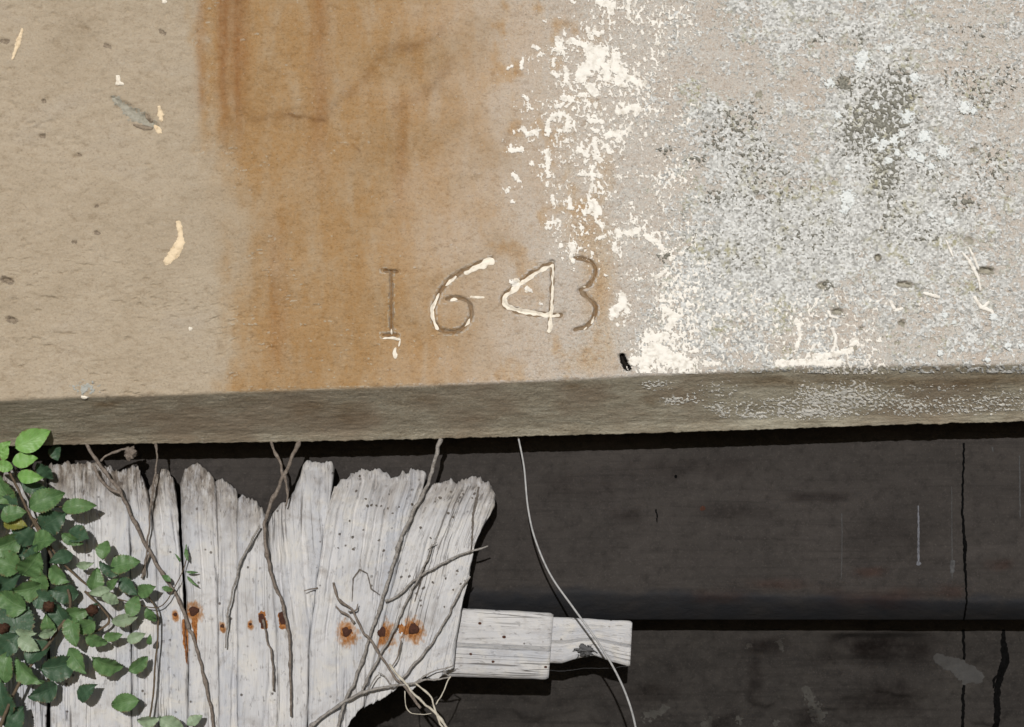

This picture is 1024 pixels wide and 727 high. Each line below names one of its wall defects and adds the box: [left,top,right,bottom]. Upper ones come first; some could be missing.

spalling [111,75,165,134]
peeling [497,0,942,405]
crack [960,443,968,660]
crack [959,685,967,727]
crack [992,630,1010,727]